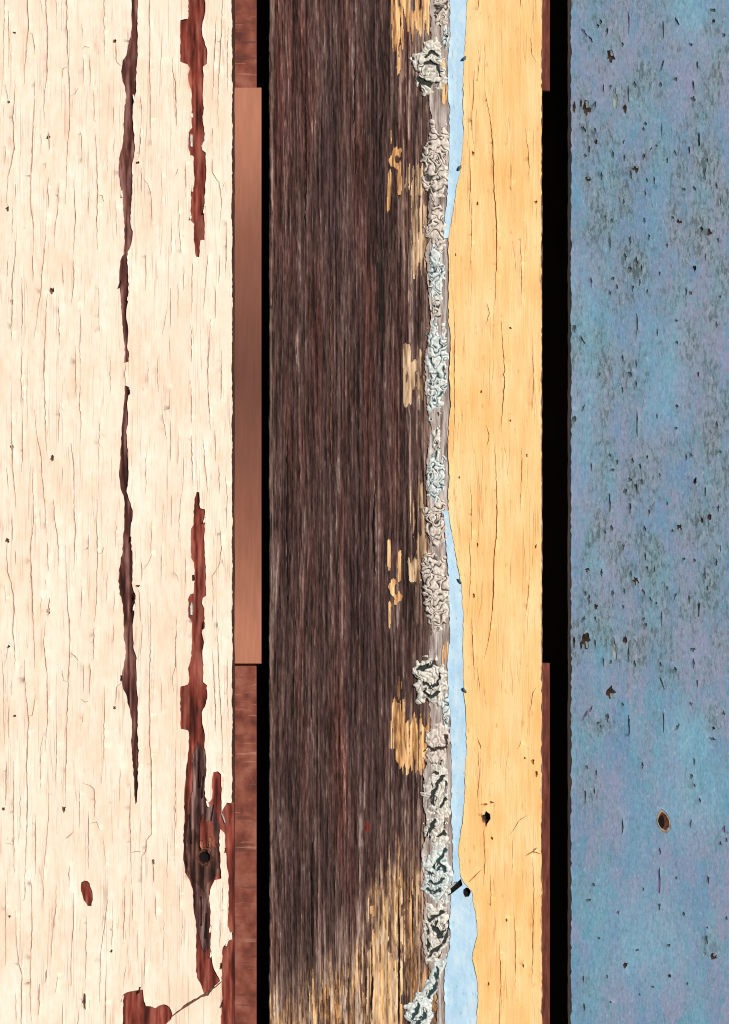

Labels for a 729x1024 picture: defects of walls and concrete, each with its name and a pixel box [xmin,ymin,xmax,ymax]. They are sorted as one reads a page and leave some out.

peeling [113,0,140,363]
peeling [180,0,207,257]
water stain [404,163,424,196]
crack [1,0,229,1024]
peeling [113,386,140,804]
water stain [407,557,427,585]
peeling [180,492,234,1024]
peeling [81,881,93,906]
peeling [122,987,172,1024]
water stain [361,888,412,1024]
water stain [415,869,426,926]